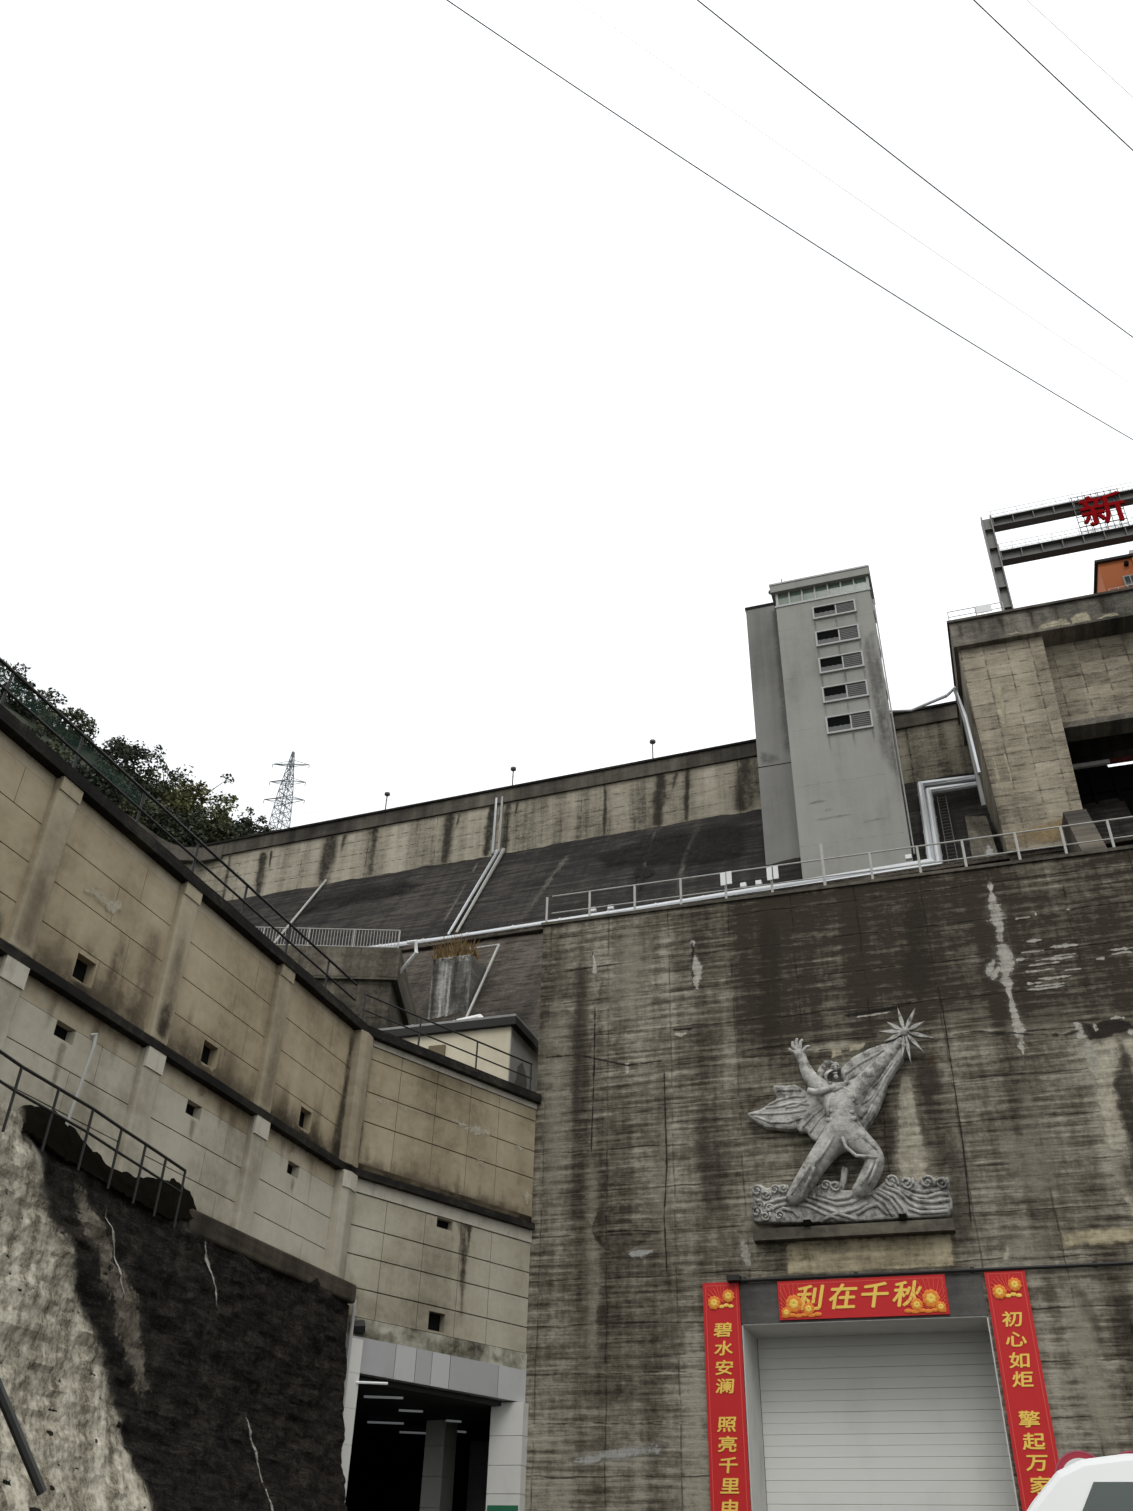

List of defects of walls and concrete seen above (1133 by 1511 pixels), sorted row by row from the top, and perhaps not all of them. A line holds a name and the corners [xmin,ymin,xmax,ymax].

efflorescence [986,884,1026,1055]
spalling [1073,1016,1133,1040]
leakage [1079,1038,1133,1216]
leakage [461,1223,472,1295]